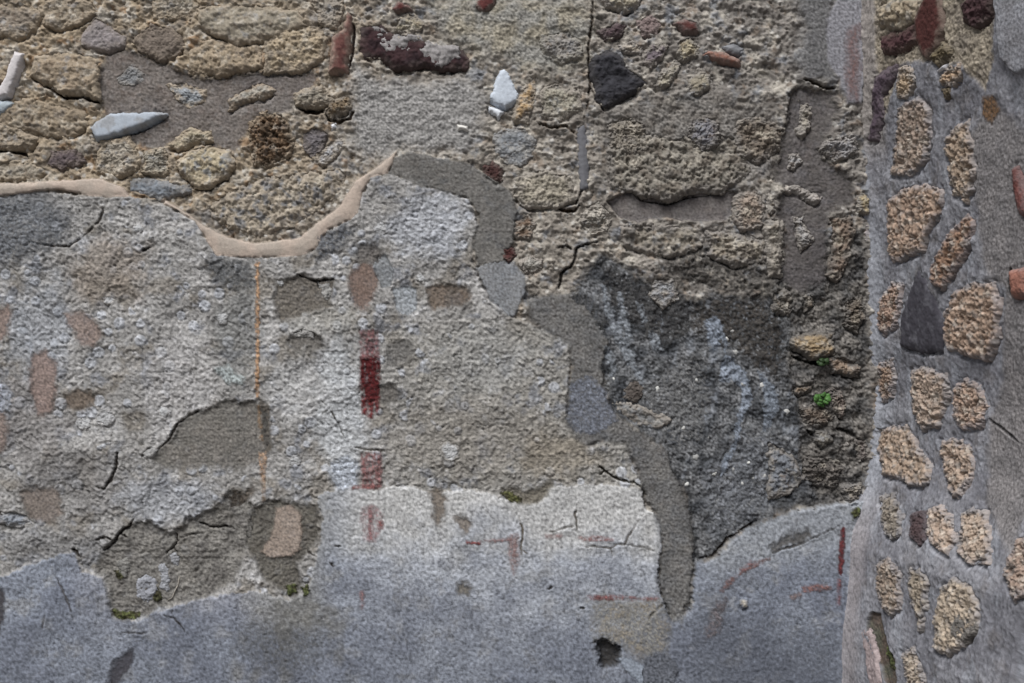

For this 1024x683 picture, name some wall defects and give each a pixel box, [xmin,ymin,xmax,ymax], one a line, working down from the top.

peeling [0,52,26,115]
crack [586,2,602,109]
crack [37,209,104,247]
crack [558,242,596,289]
crack [96,411,199,490]
flaking render [143,399,272,472]
flaking render [97,488,321,620]
crack [563,511,640,552]
flaking render [597,638,620,666]